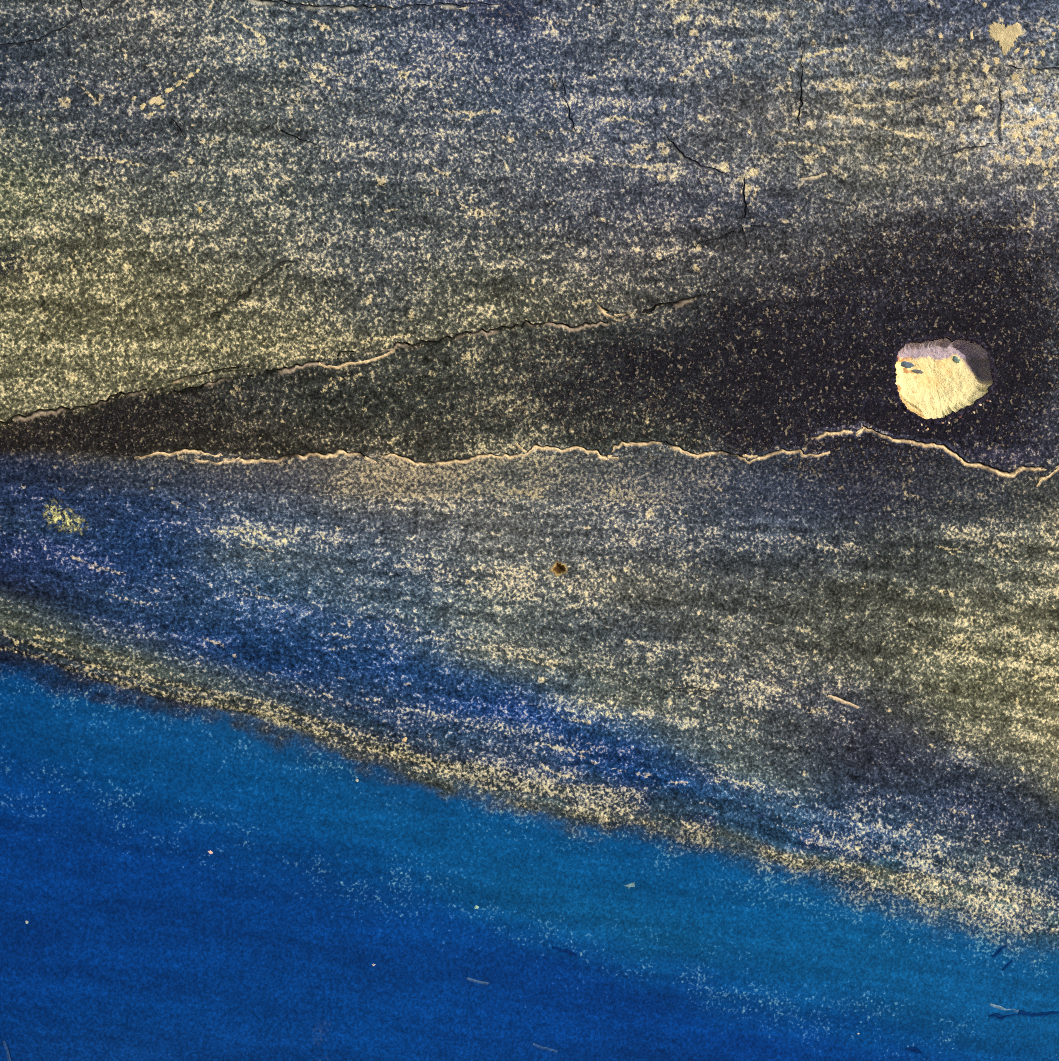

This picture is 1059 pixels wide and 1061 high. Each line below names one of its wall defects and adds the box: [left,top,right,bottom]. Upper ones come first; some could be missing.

crack [0,0,124,53]
crack [243,0,500,14]
crack [167,114,190,142]
crack [645,127,761,272]
crack [205,256,299,323]
crack [0,286,719,431]
spalling [889,331,999,431]
crack [132,421,1059,488]